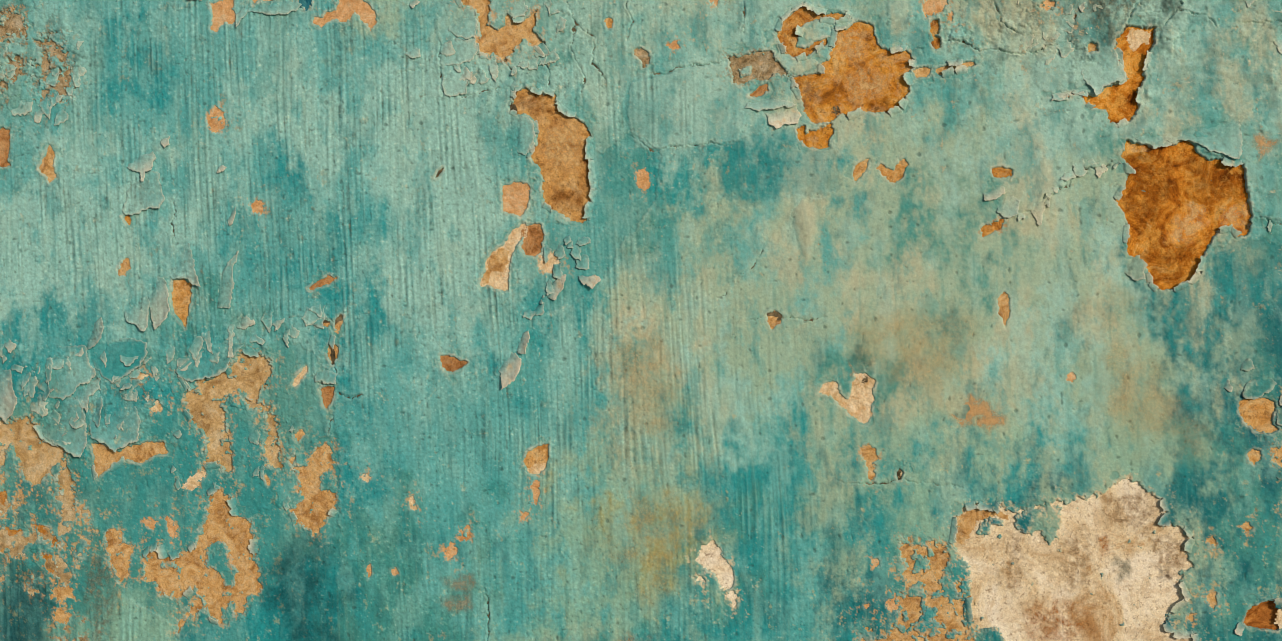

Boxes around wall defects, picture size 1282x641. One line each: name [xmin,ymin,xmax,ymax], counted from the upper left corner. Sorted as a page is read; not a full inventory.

peeling [0,8,87,167]
peeling [439,0,601,390]
peeling [730,0,975,149]
peeling [981,0,1252,293]
peeling [997,292,1010,325]
peeling [0,243,343,641]
flaking render [819,373,875,424]
peeling [1223,358,1282,480]
flaking render [693,540,737,607]
flaking render [858,477,1217,641]